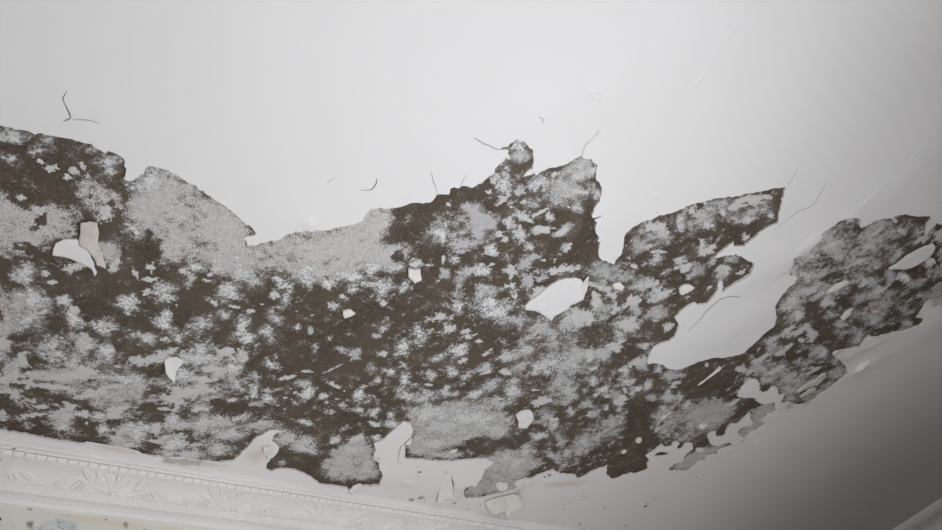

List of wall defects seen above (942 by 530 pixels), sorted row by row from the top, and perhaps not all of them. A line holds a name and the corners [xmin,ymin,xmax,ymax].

damp [80,440,279,469]
peeling [0,125,942,519]